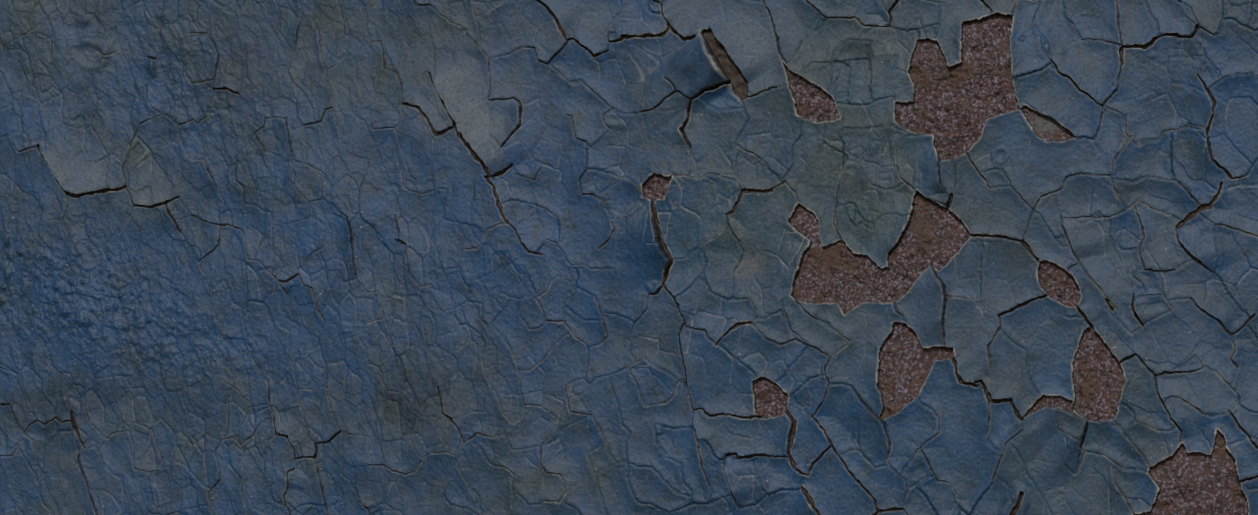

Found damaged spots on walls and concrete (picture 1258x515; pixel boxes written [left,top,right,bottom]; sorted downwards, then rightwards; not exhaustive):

peeling [780,60,843,126]
peeling [892,10,1079,164]
peeling [639,170,676,207]
crack [119,0,958,515]
peeling [785,188,974,424]
peeling [1034,258,1084,310]
crack [880,0,1258,512]
peeling [750,375,792,421]
peeling [1019,323,1129,426]
crack [0,394,179,515]
peeling [1131,427,1252,515]